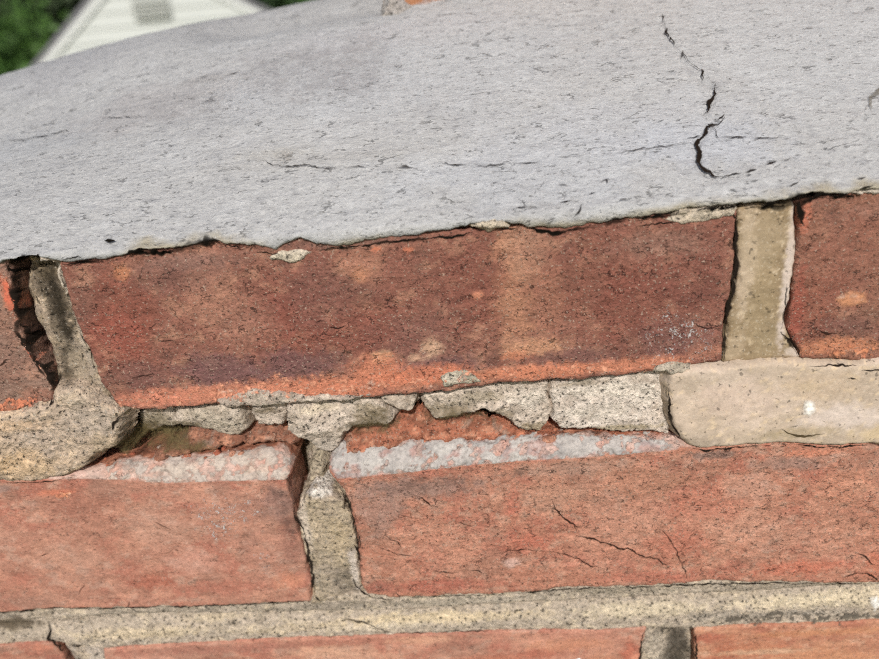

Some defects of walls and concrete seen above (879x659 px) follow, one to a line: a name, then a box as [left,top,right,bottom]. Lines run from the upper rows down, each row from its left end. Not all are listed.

crack [623,14,776,178]
crack [265,160,418,169]
crack [313,227,586,251]
crack [607,185,874,359]
spalling [139,371,668,481]
crack [668,392,866,452]
crack [343,493,409,556]
crack [501,501,879,596]
crack [353,580,508,600]